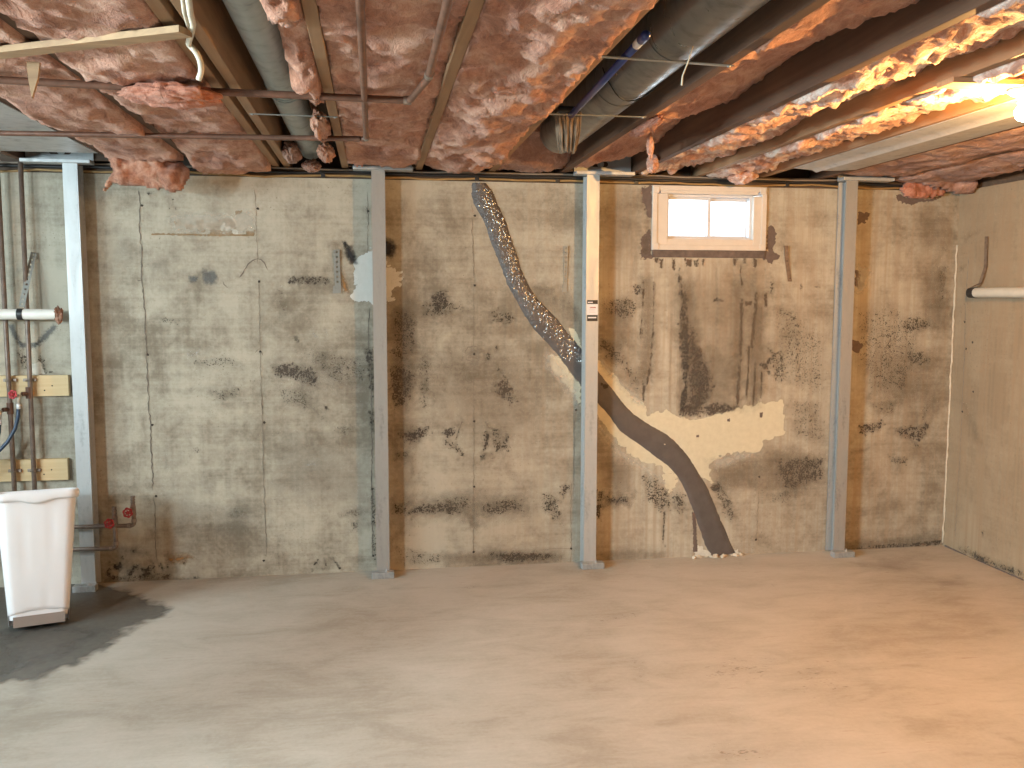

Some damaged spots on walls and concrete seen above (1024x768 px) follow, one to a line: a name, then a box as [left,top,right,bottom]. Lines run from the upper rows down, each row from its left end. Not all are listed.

damp [387,291,461,413]
damp [485,346,518,406]
crack [465,183,760,565]
damp [598,282,654,402]
damp [655,258,825,438]
spalling [760,348,788,398]
damp [858,308,930,392]
damp [858,402,893,437]
damp [394,497,524,516]
damp [542,485,570,519]
damp [490,552,555,563]
damp [0,550,170,682]